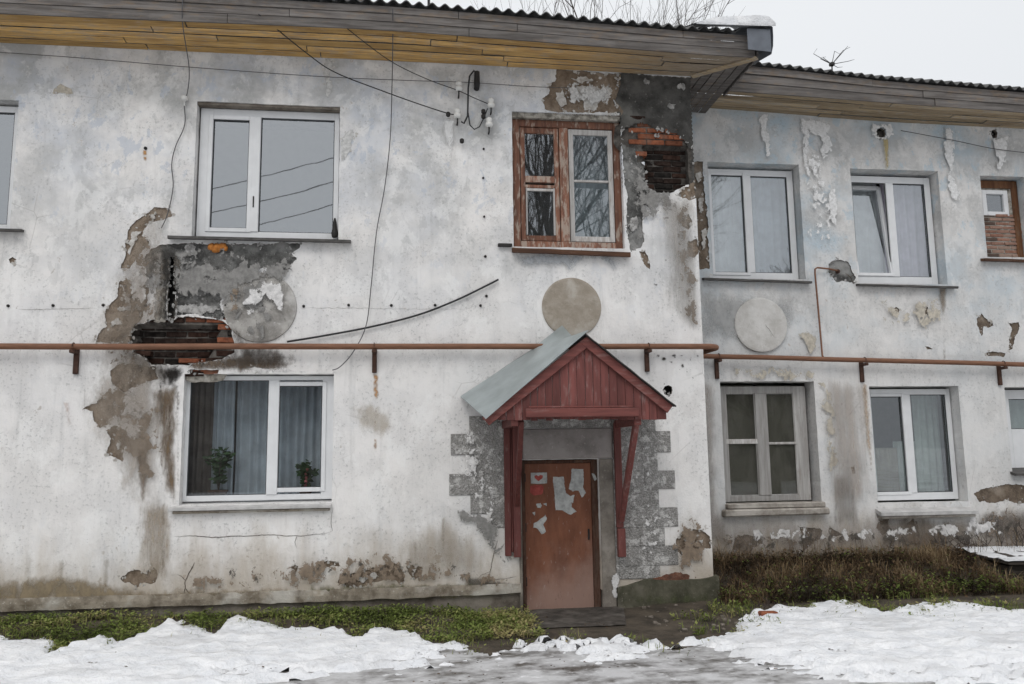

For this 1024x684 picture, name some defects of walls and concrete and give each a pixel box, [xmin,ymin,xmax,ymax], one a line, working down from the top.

spalling [541,69,711,327]
peeling [759,114,771,156]
peeling [800,119,838,240]
peeling [943,128,961,200]
peeling [989,129,1009,169]
water stain [99,250,175,491]
peeling [84,205,302,478]
flaking render [976,314,993,335]
flaking render [985,322,1019,357]
peeling [672,484,1024,578]
flaking render [118,562,160,591]
peeling [193,553,507,593]